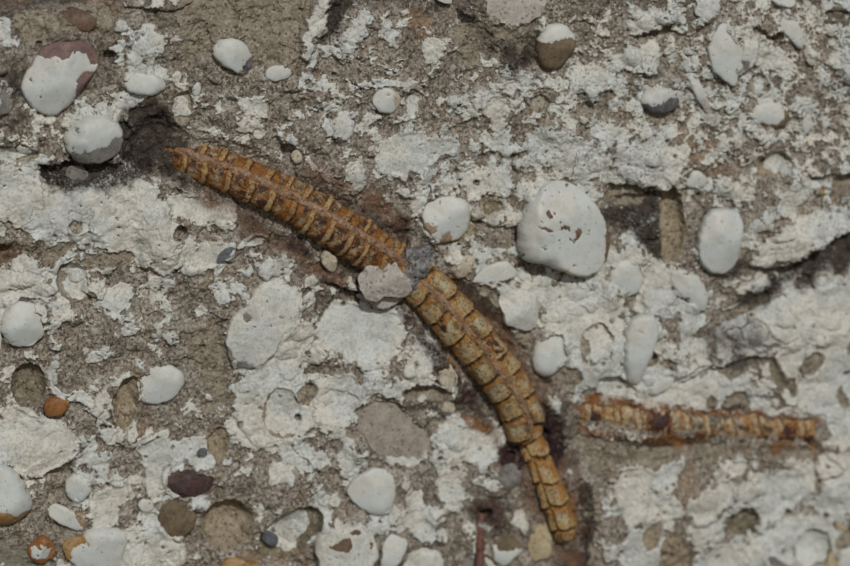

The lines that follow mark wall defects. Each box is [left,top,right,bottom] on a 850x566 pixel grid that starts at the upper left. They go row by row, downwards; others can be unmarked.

peeling [564,4,678,100]
peeling [0,157,270,308]
corrosion [165,144,409,287]
peeling [527,125,692,193]
peeling [749,179,850,268]
peeling [0,402,84,479]
peeling [86,429,216,566]
peeling [180,299,445,450]
peeling [434,417,507,514]
corrosion [399,263,577,543]
corrosion [575,393,819,453]
peeling [565,254,850,566]